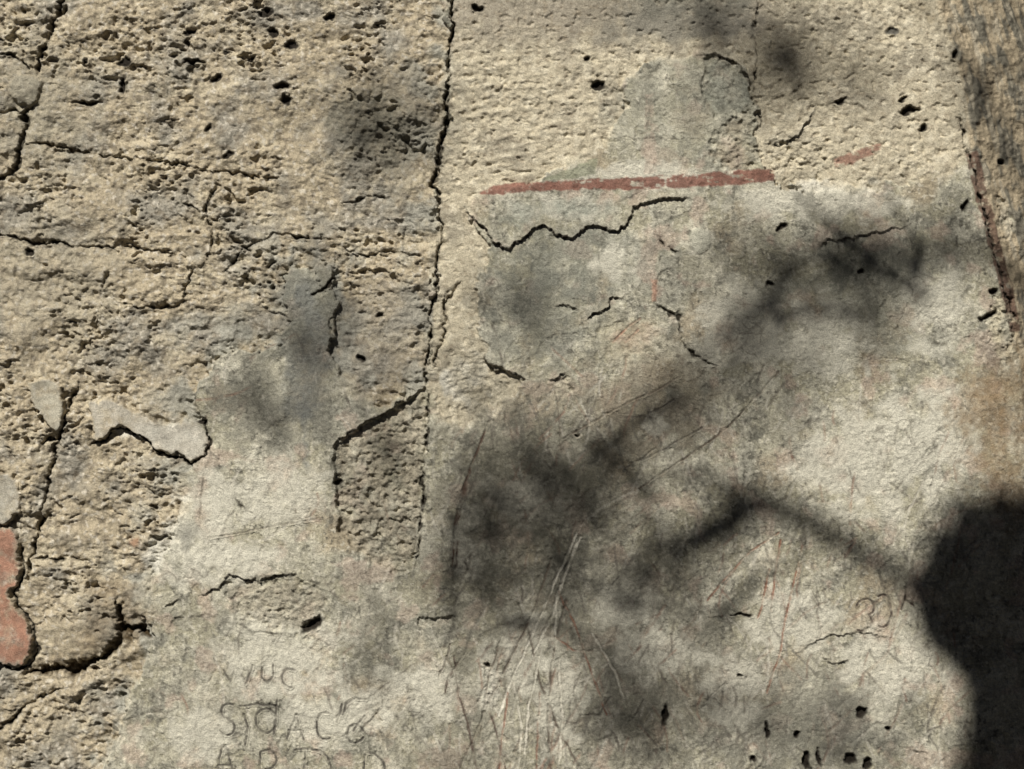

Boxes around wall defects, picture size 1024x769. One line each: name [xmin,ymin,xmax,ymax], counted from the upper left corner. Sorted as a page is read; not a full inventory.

crack [0,0,463,583]
crack [958,112,1017,320]